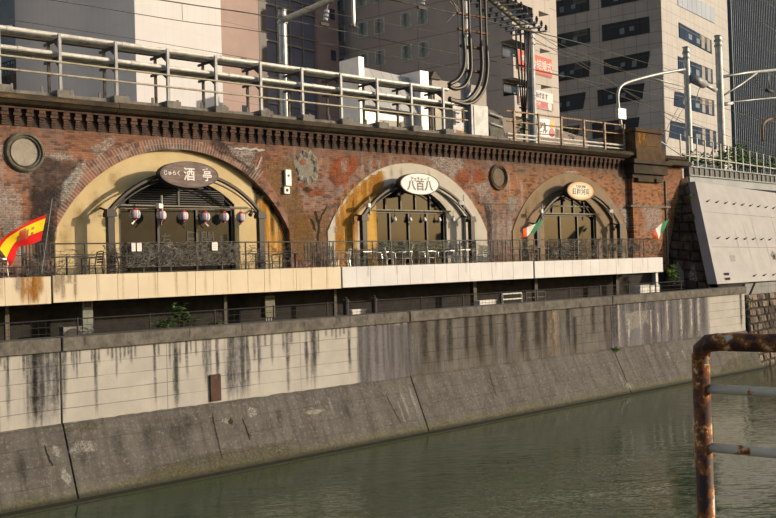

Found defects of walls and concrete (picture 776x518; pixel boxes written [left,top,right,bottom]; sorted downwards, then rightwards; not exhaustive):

corrosion [268,161,388,267]
corrosion [17,276,43,298]
damp [169,334,273,391]
damp [305,297,709,383]